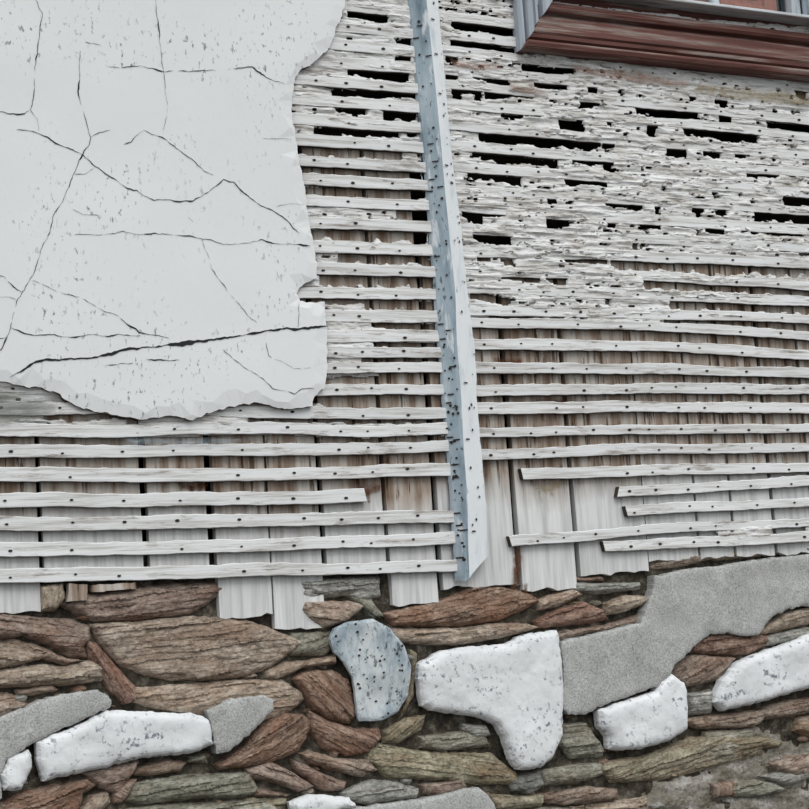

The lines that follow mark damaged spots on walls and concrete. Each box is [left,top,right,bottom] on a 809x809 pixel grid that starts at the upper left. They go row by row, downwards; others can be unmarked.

flaking render [291,0,418,137]
flaking render [365,133,420,142]
flaking render [438,0,809,323]
crack [0,2,328,394]
flaking render [306,206,399,220]
flaking render [315,237,338,262]
flaking render [300,275,346,288]
flaking render [325,302,398,332]
flaking render [0,382,65,403]
flaking render [0,415,127,425]
flaking render [136,403,264,437]
flaking render [716,525,772,539]